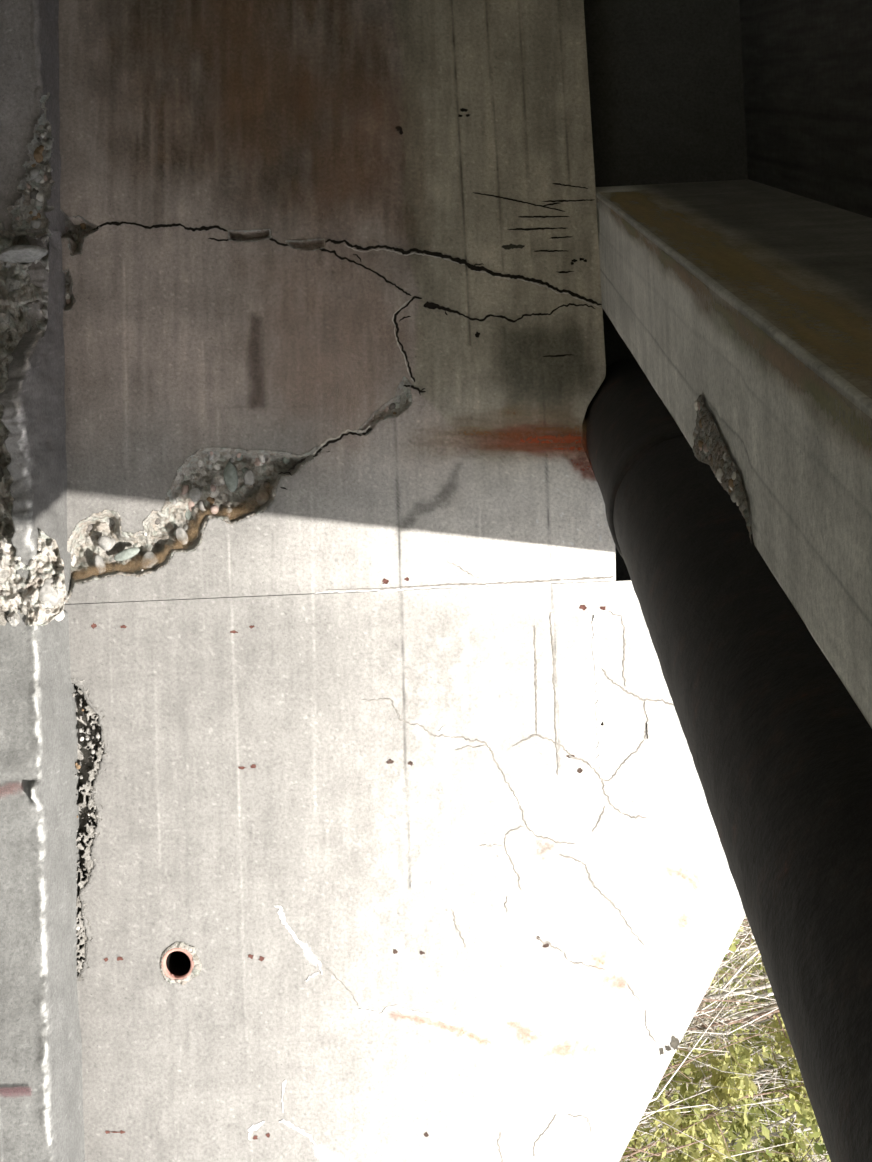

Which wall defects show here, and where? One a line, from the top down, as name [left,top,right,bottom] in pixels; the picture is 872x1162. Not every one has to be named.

crack [92,221,236,241]
crack [319,239,602,396]
spalling [0,93,325,627]
spalling [357,377,413,436]
rust [448,414,595,479]
spalling [692,394,752,539]
crack [315,561,613,594]
crack [363,611,674,949]
crack [537,937,605,970]
crack [324,966,359,1007]
crack [628,985,657,1043]
crack [533,1112,592,1156]